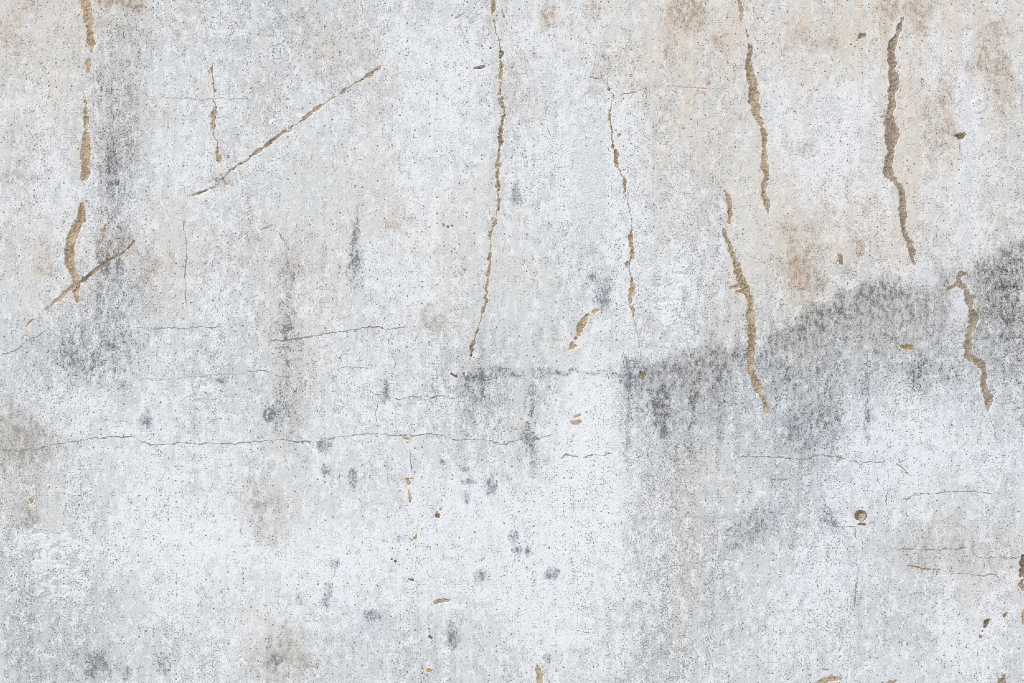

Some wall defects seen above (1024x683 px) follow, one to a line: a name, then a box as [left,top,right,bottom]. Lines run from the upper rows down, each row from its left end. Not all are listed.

crack [0,100,135,356]
crack [80,0,96,74]
crack [161,64,382,196]
crack [0,326,612,470]
crack [469,0,507,360]
crack [569,309,608,373]
crack [592,54,716,355]
crack [722,190,769,413]
crack [738,0,771,215]
water stain [610,43,1024,491]
crack [881,17,916,266]
crack [947,271,1013,439]